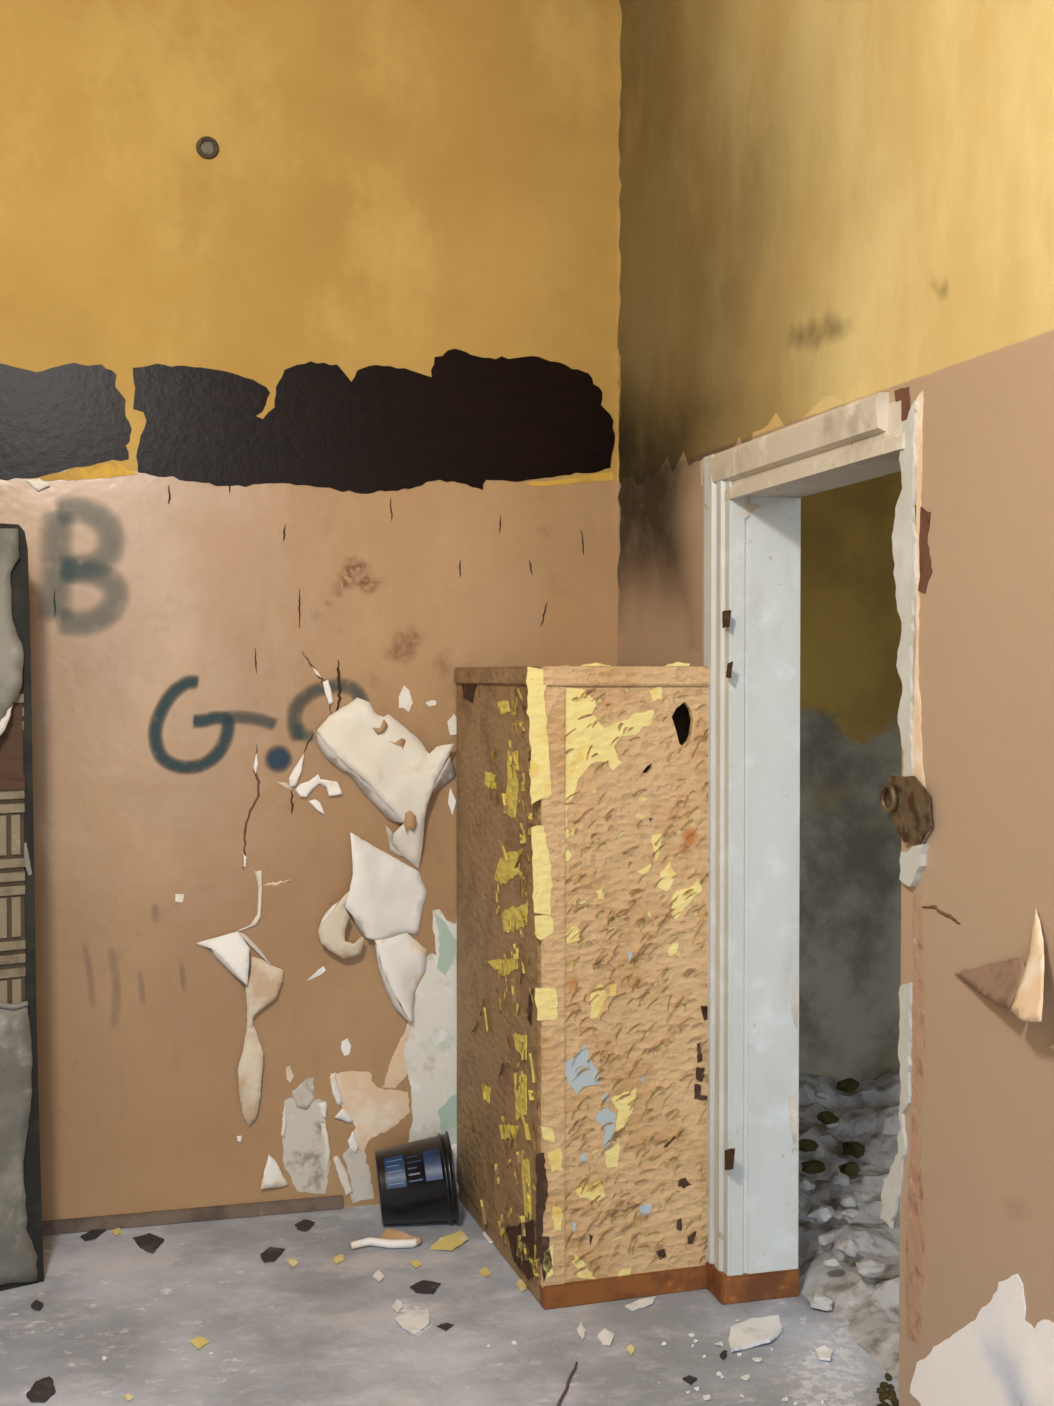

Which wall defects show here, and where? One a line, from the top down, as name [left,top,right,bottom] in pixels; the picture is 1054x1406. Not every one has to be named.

peeling [26,478,50,491]
crack [302,652,342,715]
peeling [399,686,436,712]
peeling [447,714,457,735]
peeling [278,732,342,814]
peeling [448,788,456,815]
crack [236,745,291,932]
flaking render [261,909,459,1203]
flaking render [906,895,1054,1406]